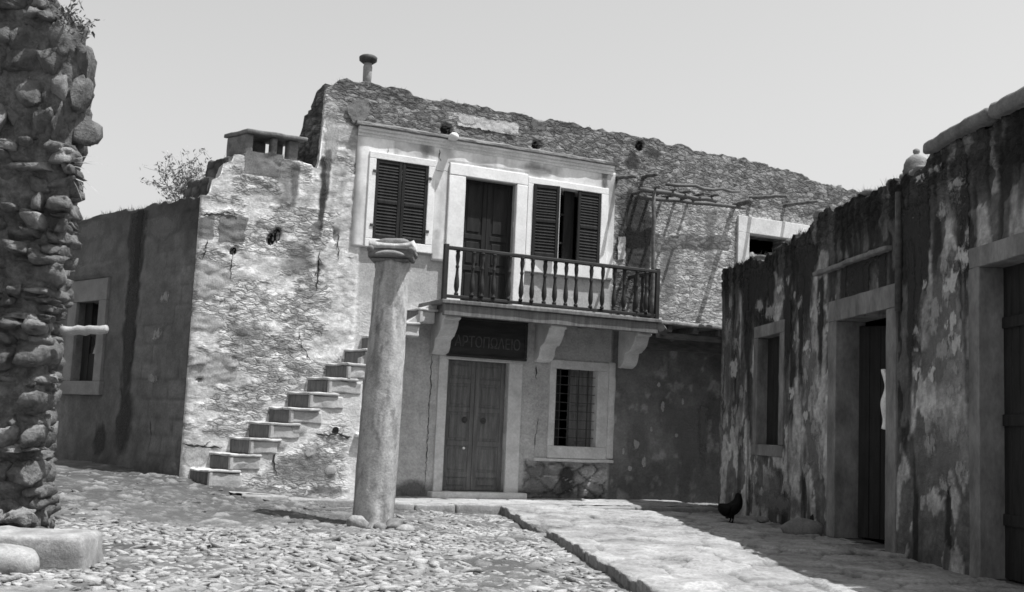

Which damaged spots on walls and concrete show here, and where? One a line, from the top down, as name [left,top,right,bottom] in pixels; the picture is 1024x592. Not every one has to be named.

water stain [94,210,179,453]
crack [315,232,340,291]
crack [424,356,433,487]
peeling [719,294,747,450]
water stain [741,244,824,385]
peeling [757,275,820,404]
water stain [839,247,886,299]
water stain [901,180,930,395]
peeling [913,227,969,400]
peeling [938,177,966,217]
water stain [949,152,969,278]